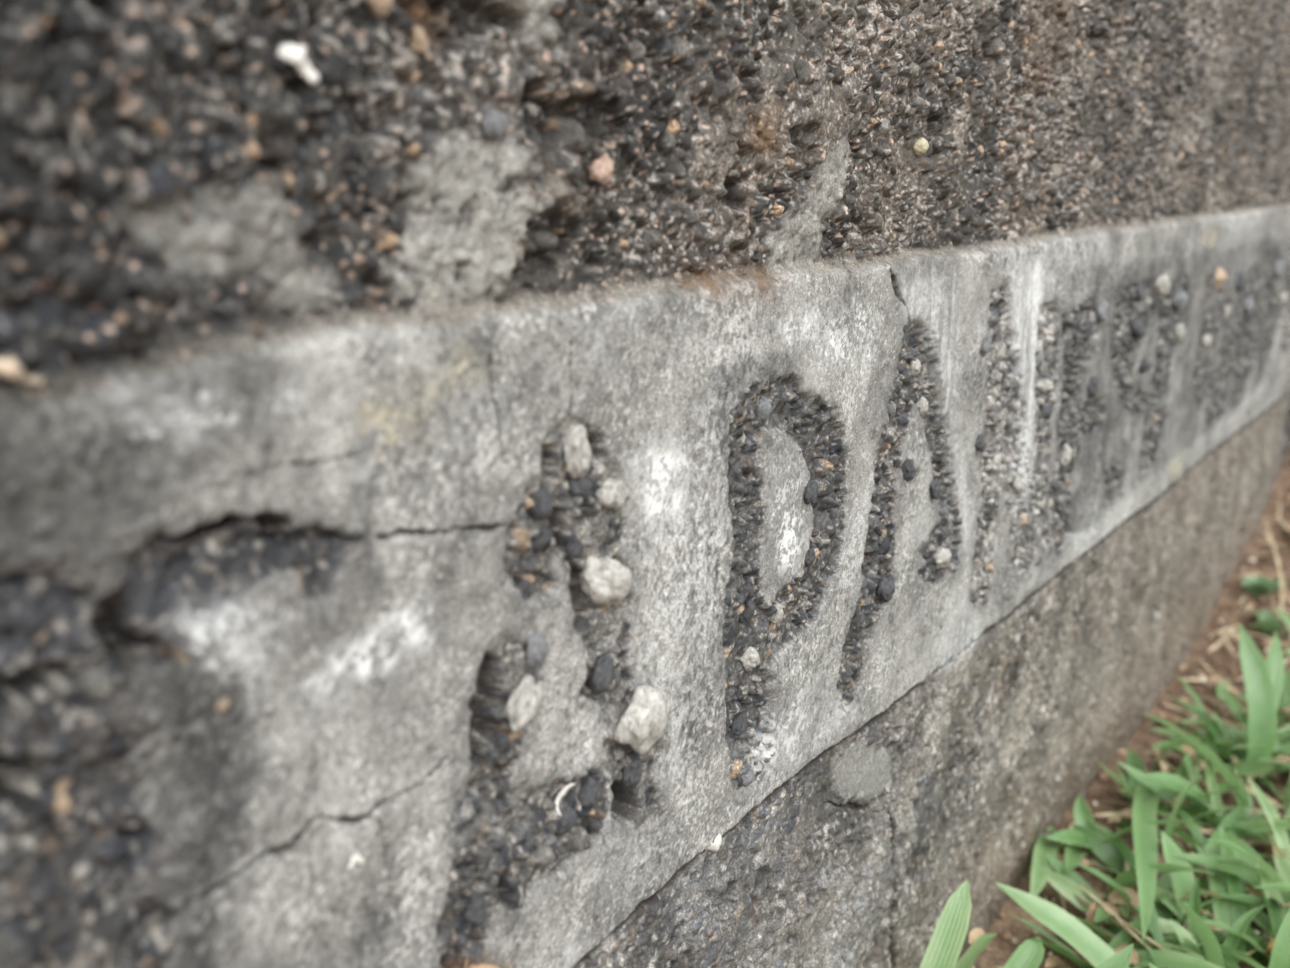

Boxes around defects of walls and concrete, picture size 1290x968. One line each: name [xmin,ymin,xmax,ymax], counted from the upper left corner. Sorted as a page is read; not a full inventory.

crack [376,522,507,537]
crack [233,806,391,881]
peeling [346,852,365,870]